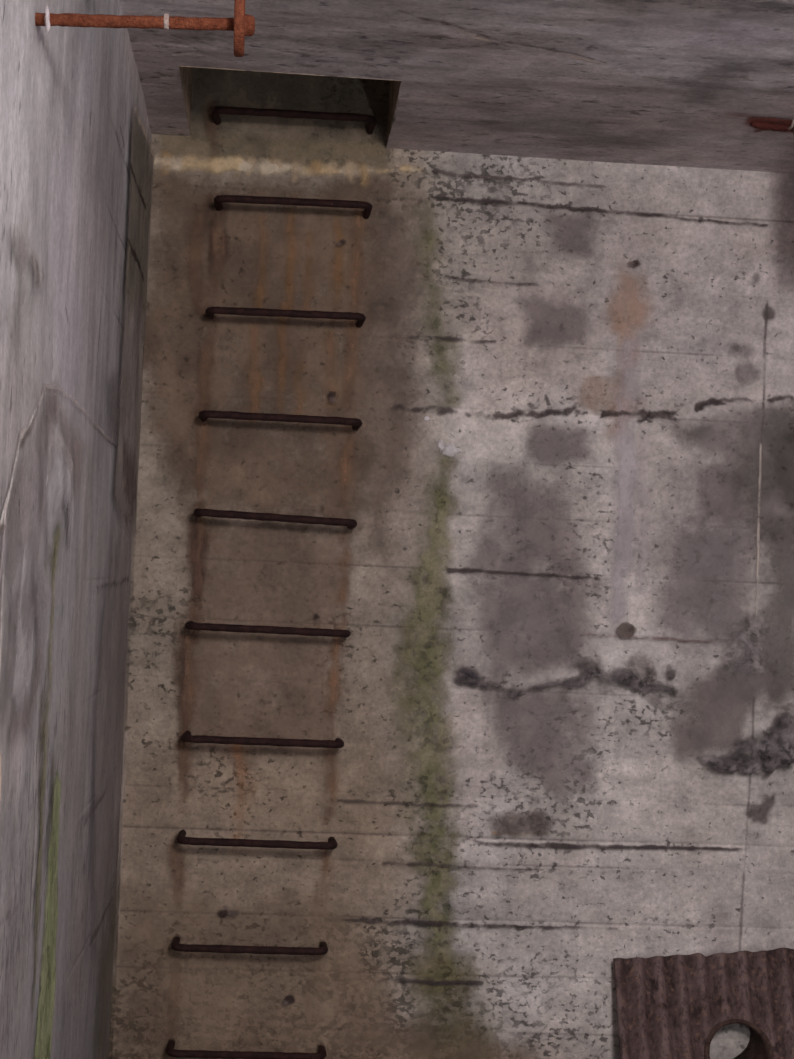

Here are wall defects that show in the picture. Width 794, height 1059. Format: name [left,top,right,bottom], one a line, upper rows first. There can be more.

rust [739,115,793,132]
crack [432,169,768,226]
crack [763,303,775,351]
crack [395,386,793,422]
crack [0,357,117,580]
leakage [531,427,587,460]
leakage [474,485,585,669]
leakage [674,407,794,756]
leakage [11,574,46,736]
rust [178,507,207,792]
spalling [699,703,794,777]
spalling [747,795,775,823]